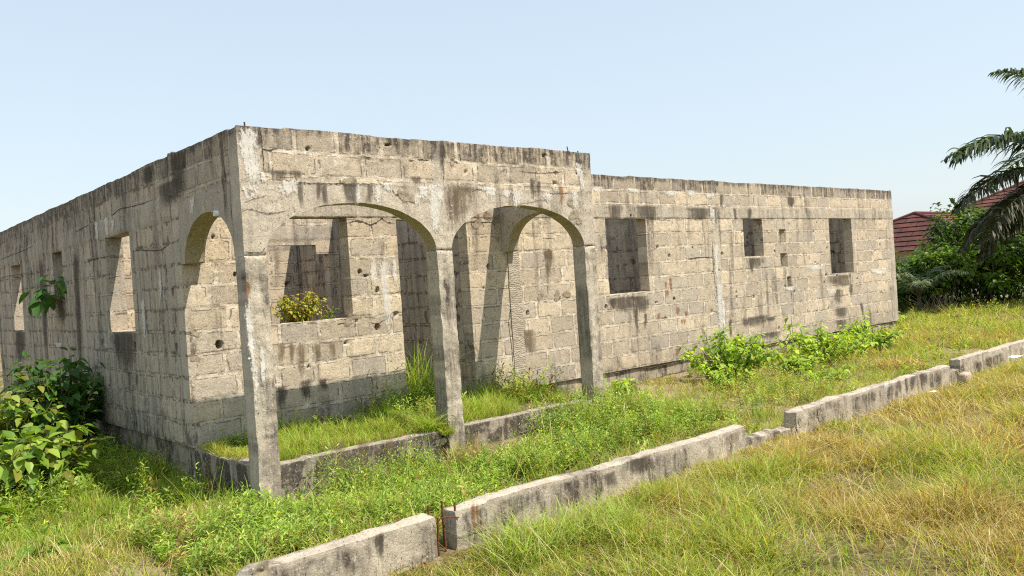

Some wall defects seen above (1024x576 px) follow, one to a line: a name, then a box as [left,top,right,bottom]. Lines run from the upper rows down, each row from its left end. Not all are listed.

damp [143,152,184,204]
damp [631,455,650,471]